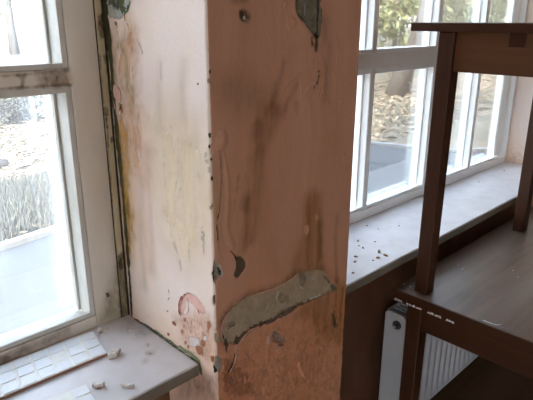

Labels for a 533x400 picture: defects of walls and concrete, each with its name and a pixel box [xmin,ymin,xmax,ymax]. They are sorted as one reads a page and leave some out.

peeling [107,0,130,27]
peeling [296,0,322,50]
damp [101,0,140,315]
spalling [212,260,223,283]
peeling [178,293,205,316]
flaking render [215,270,337,352]